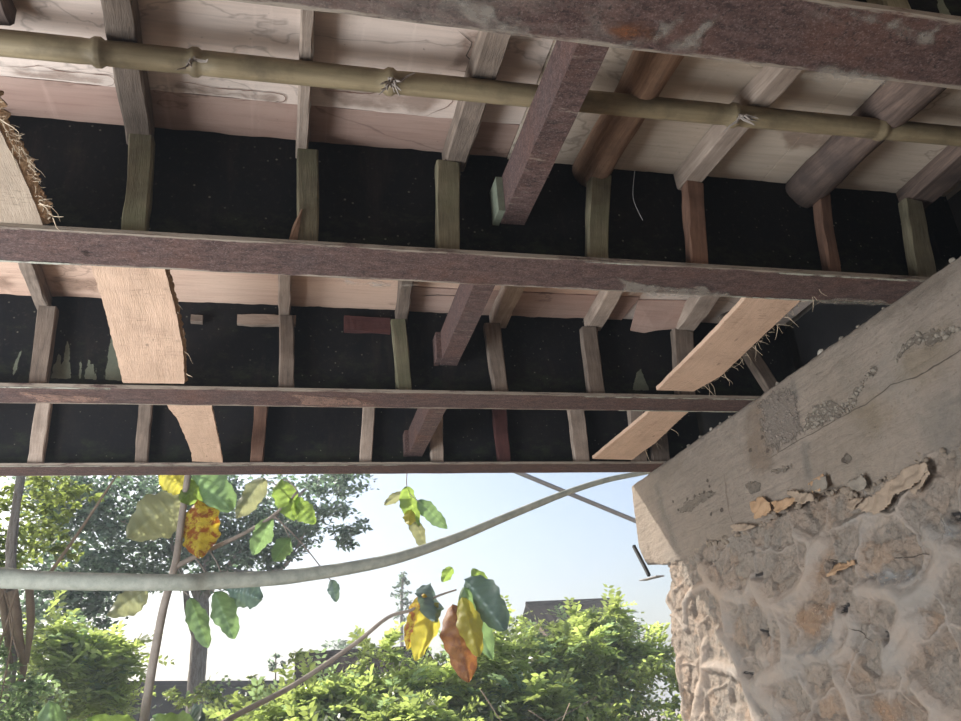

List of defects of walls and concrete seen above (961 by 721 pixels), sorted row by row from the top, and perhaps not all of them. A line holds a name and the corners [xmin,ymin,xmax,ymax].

crack [724,350,961,524]
spalling [808,474,895,502]